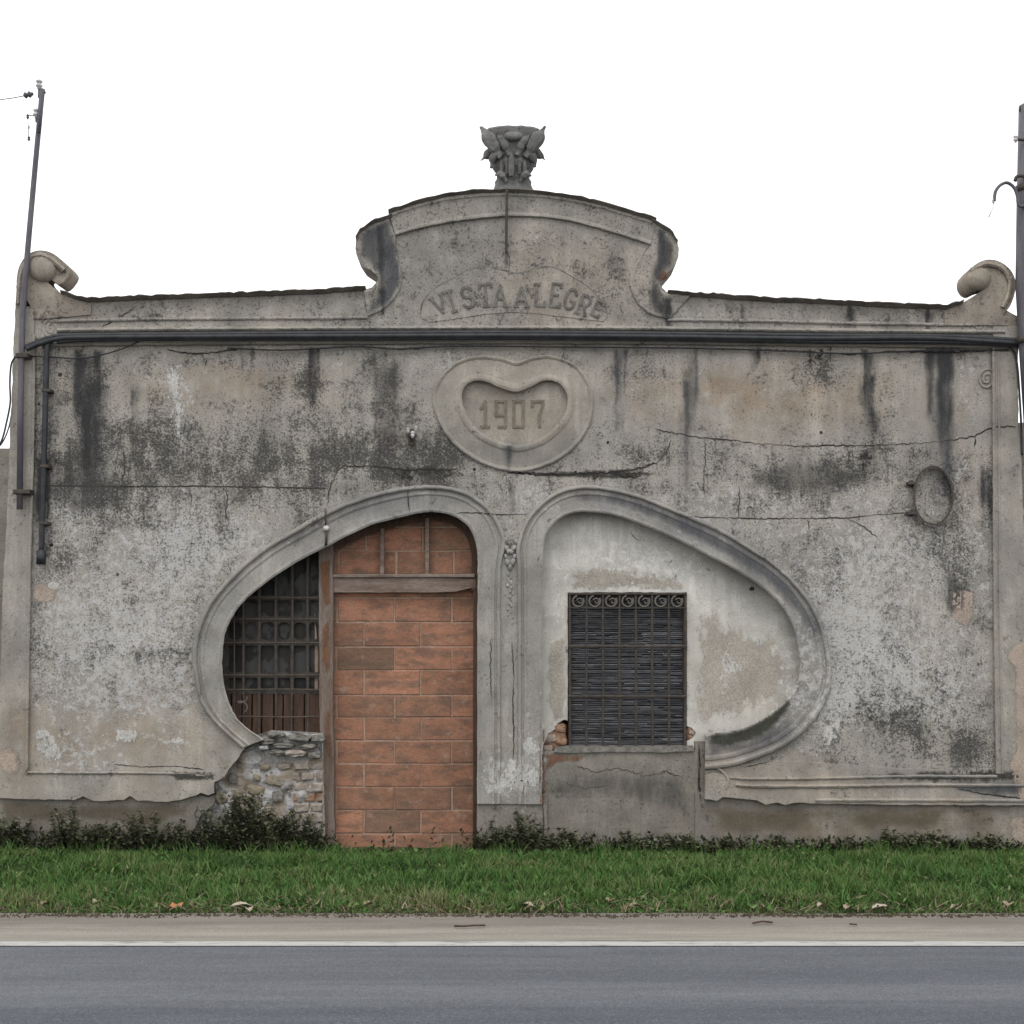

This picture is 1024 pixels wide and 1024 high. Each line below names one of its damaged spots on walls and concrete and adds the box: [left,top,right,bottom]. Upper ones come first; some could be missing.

leakage [363,226,398,314]
leakage [652,231,671,326]
leakage [75,351,101,475]
leakage [864,351,877,428]
leakage [925,349,953,467]
leakage [36,460,49,512]
crack [46,449,455,545]
crack [510,469,579,477]
crack [605,425,1019,537]
spalling [194,713,331,847]
peeling [487,722,567,794]
spalling [1008,642,1024,799]